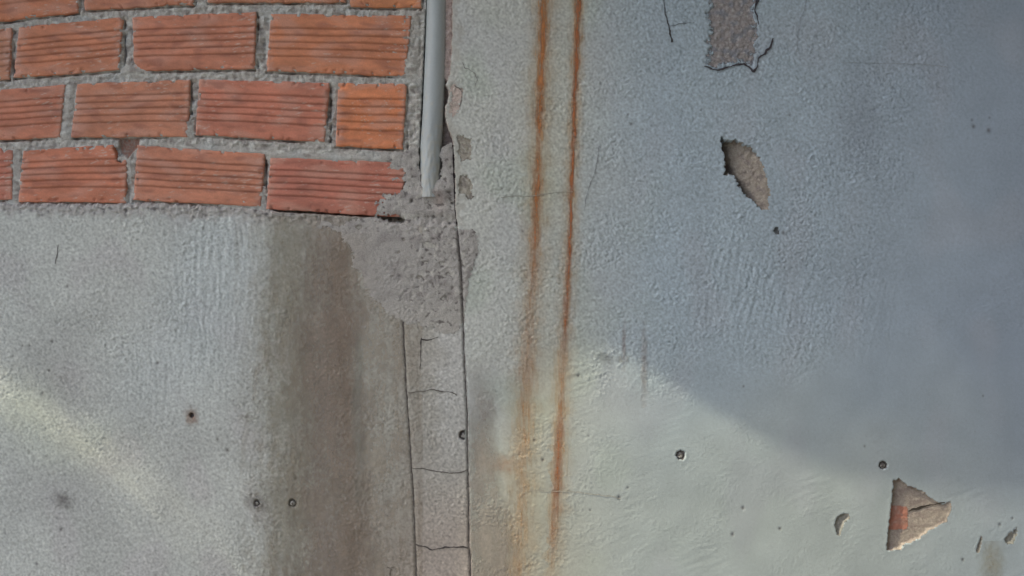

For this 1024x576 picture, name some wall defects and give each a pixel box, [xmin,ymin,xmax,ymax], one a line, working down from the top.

crack [664,3,694,42]
flaking render [706,0,759,68]
rust [537,0,547,140]
peeling [456,135,472,162]
peeling [458,175,474,200]
rust [567,0,581,298]
flaking render [720,139,771,210]
crack [387,145,471,576]
damp [277,226,417,576]
flaking render [834,514,850,536]
flaking render [887,478,952,550]